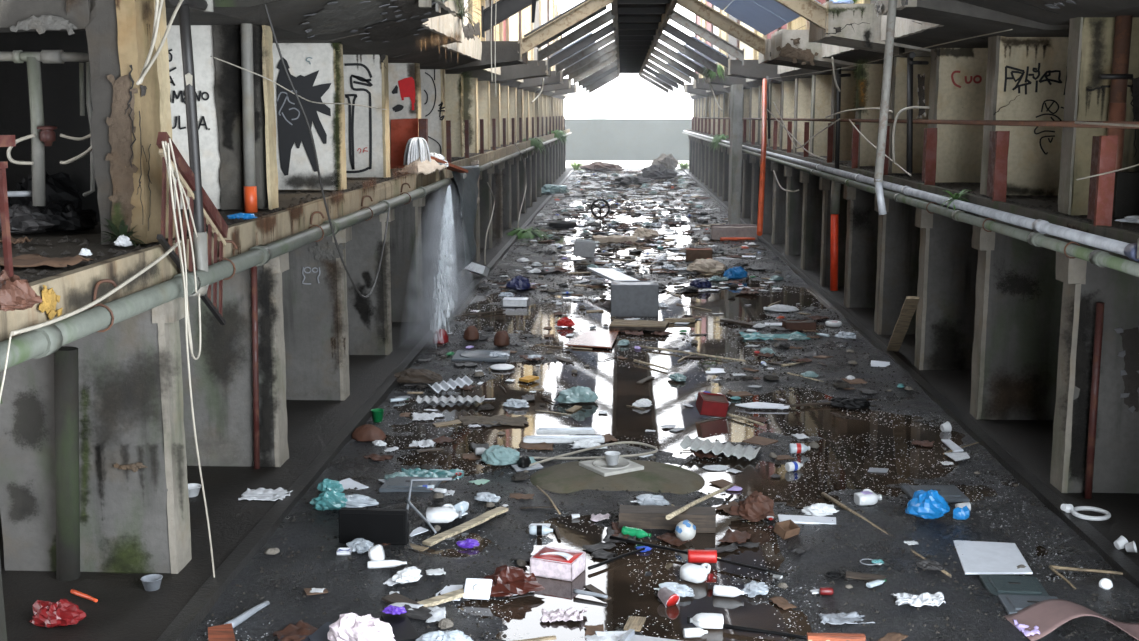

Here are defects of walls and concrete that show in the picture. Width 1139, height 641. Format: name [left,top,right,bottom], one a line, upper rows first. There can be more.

water stain [1086,20,1106,115]
spalling [105,74,147,237]
water stain [12,391,46,451]
water stain [7,484,36,522]